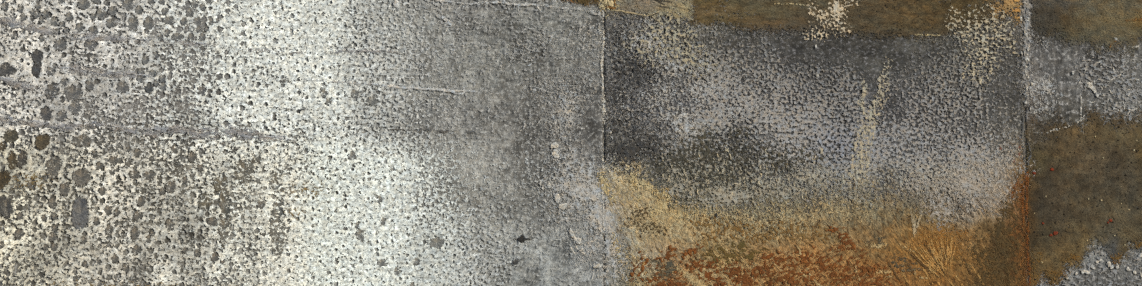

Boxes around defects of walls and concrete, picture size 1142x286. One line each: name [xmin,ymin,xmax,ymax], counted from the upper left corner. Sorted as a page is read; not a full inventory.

corrosion [544,0,601,8]
leakage [513,71,685,286]
leakage [702,237,772,266]
corrosion [593,136,1080,286]